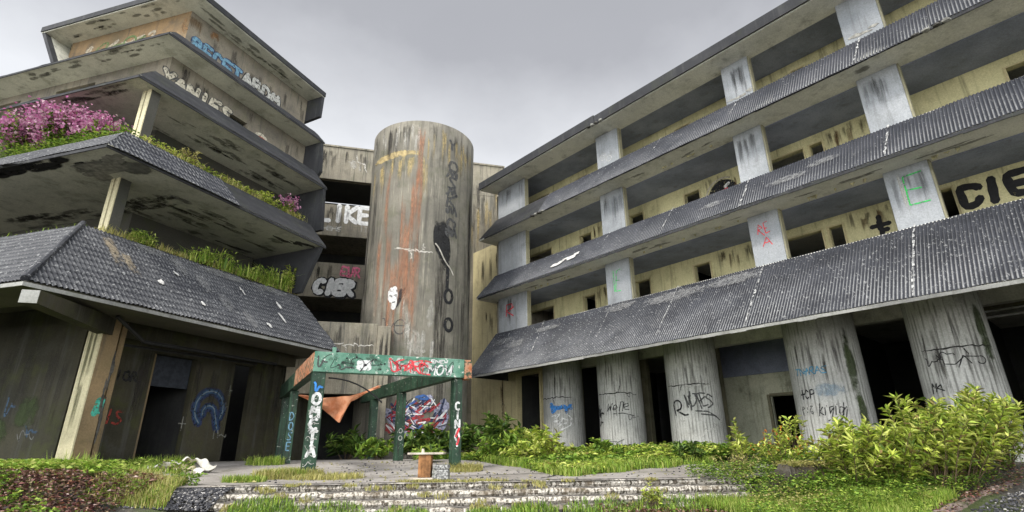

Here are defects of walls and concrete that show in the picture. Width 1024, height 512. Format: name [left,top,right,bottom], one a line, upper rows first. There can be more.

damp [0,157,103,178]
corrosion [377,134,424,326]
peeling [526,251,580,289]